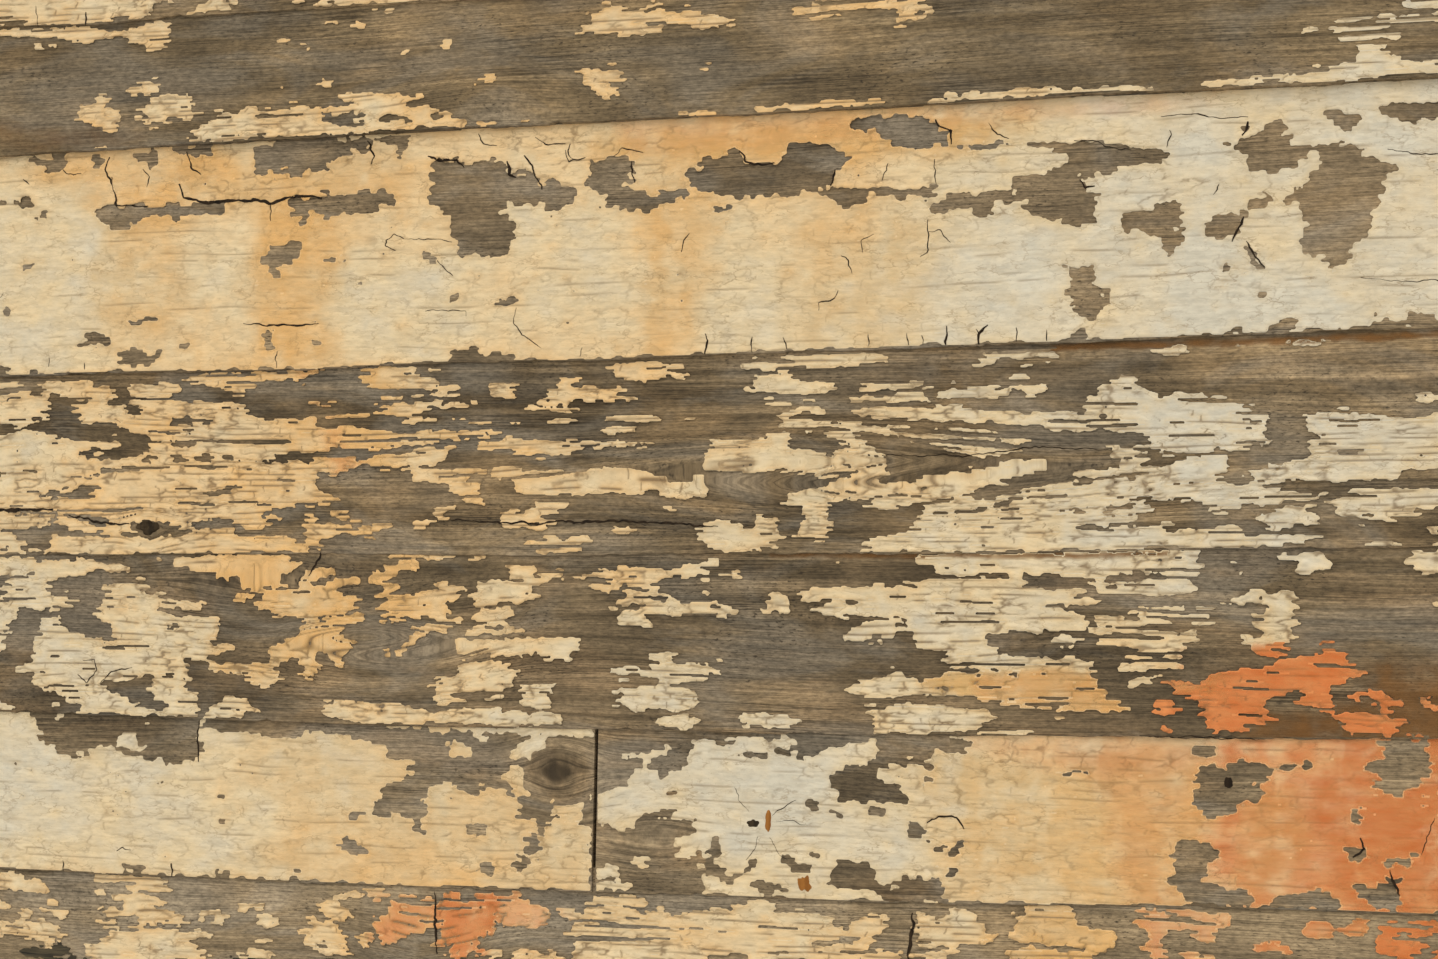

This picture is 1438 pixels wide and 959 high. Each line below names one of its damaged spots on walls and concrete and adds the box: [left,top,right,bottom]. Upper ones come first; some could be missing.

peeling [0,0,1438,425]
peeling [0,380,709,959]
peeling [556,375,1438,959]